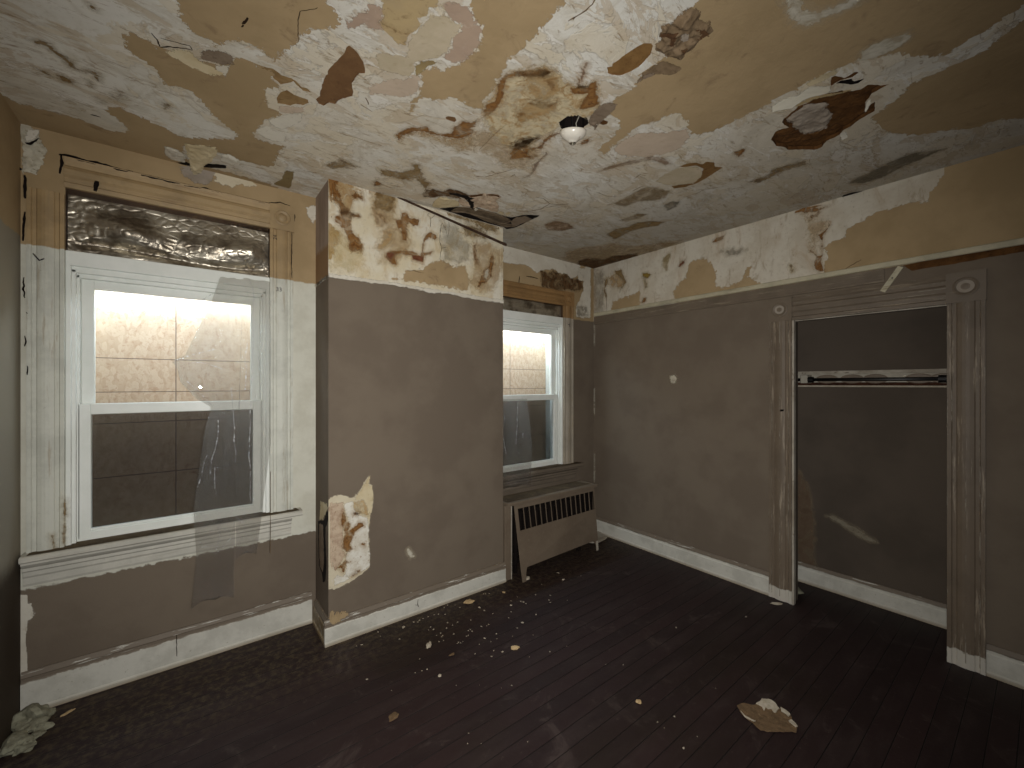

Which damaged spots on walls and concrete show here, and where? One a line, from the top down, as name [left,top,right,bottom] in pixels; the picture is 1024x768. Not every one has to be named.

peeling [3,0,566,188]
leakage [396,62,600,159]
peeling [588,0,1024,189]
peeling [306,205,316,223]
peeling [329,223,340,259]
peeling [594,168,944,317]
flaking render [318,501,370,585]
peeling [21,595,35,672]